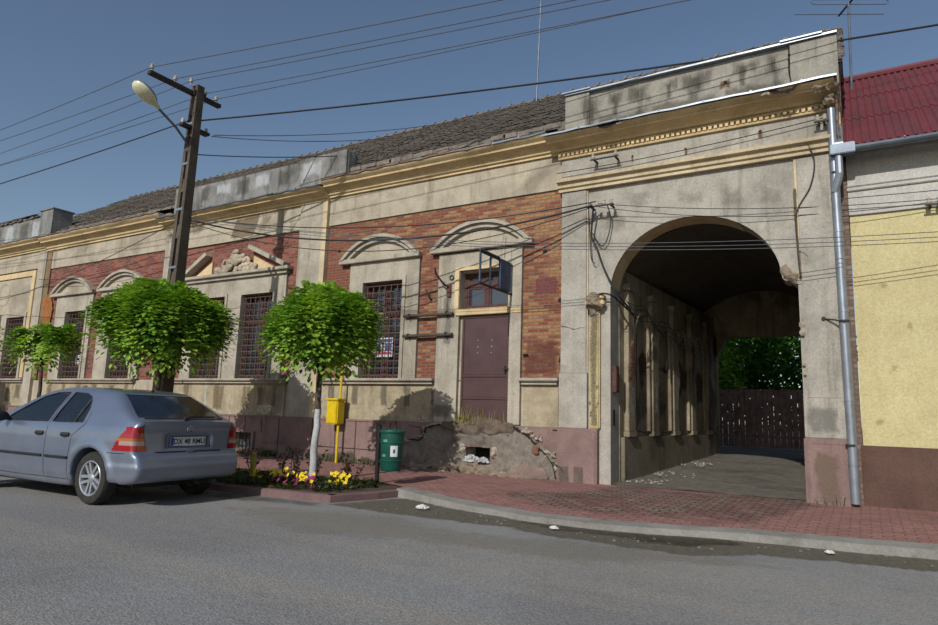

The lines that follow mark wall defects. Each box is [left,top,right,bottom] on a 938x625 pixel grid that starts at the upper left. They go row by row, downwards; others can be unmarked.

crack [786,47,794,83]
flaking render [780,264,799,284]
flaking render [402,426,557,481]